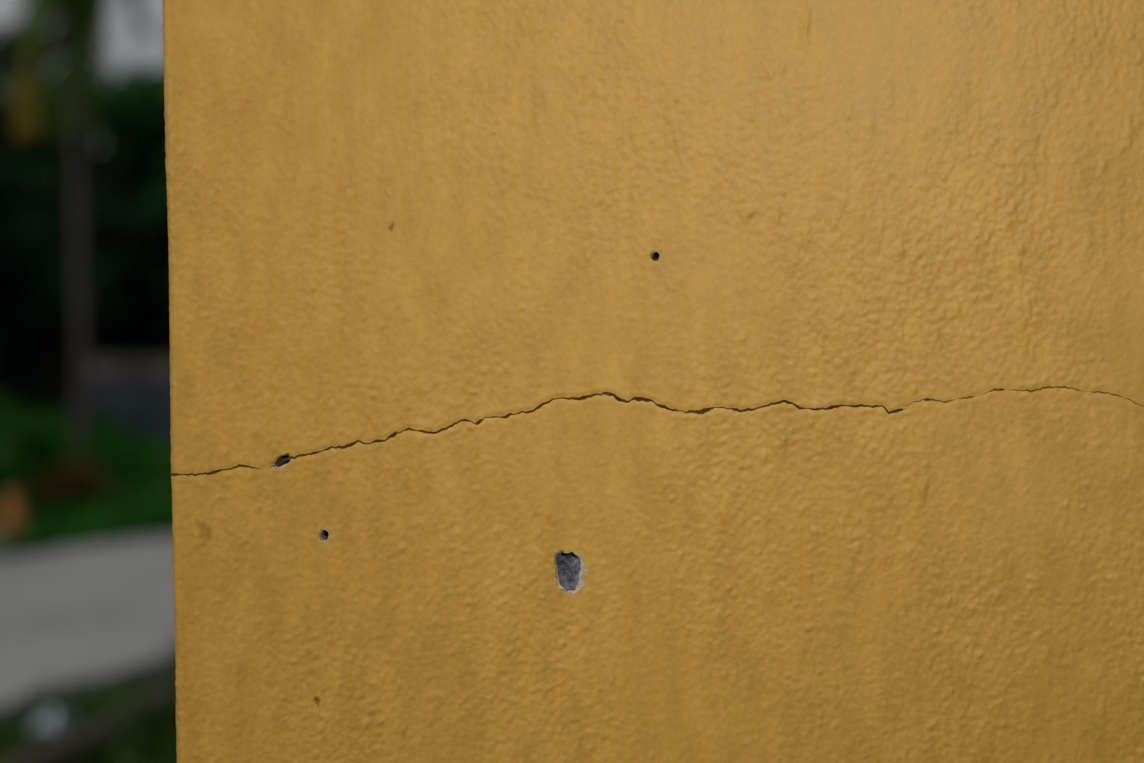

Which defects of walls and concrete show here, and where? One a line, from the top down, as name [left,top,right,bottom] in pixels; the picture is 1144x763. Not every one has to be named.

crack [170,386,1144,476]
spalling [555,551,588,595]